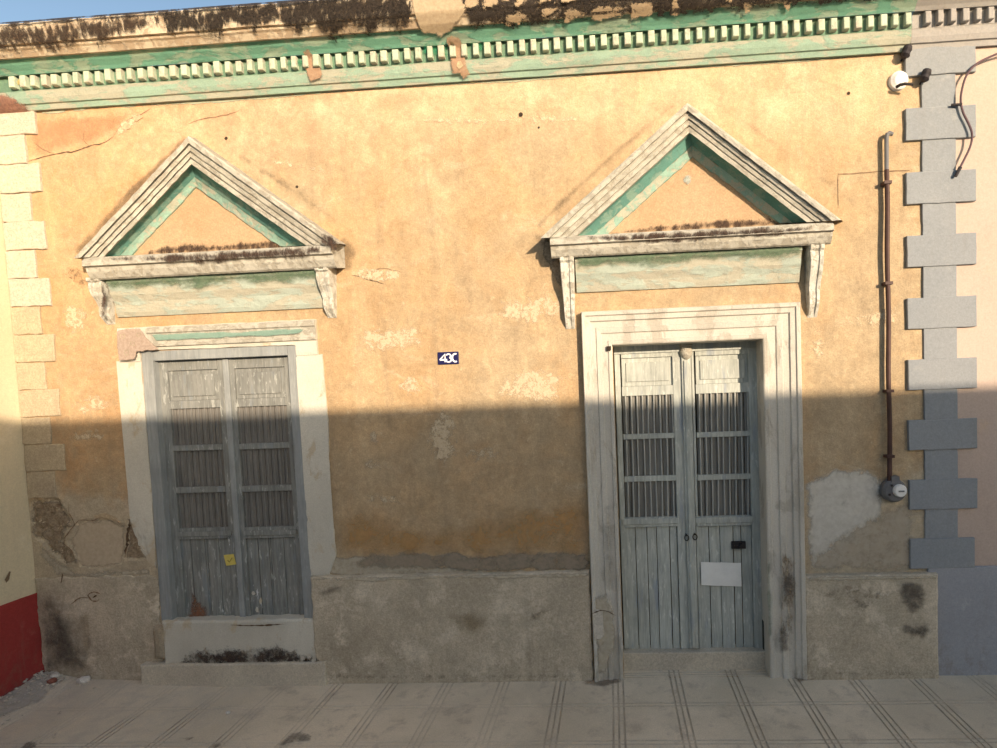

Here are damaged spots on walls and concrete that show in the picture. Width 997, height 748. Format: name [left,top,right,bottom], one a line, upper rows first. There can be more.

peeling [412,0,470,79]
spalling [303,50,322,81]
spalling [0,95,29,114]
crack [30,110,148,161]
peeling [362,326,421,351]
peeling [498,369,569,404]
spalling [32,501,75,563]
spalling [124,519,145,558]
damp [903,583,924,611]